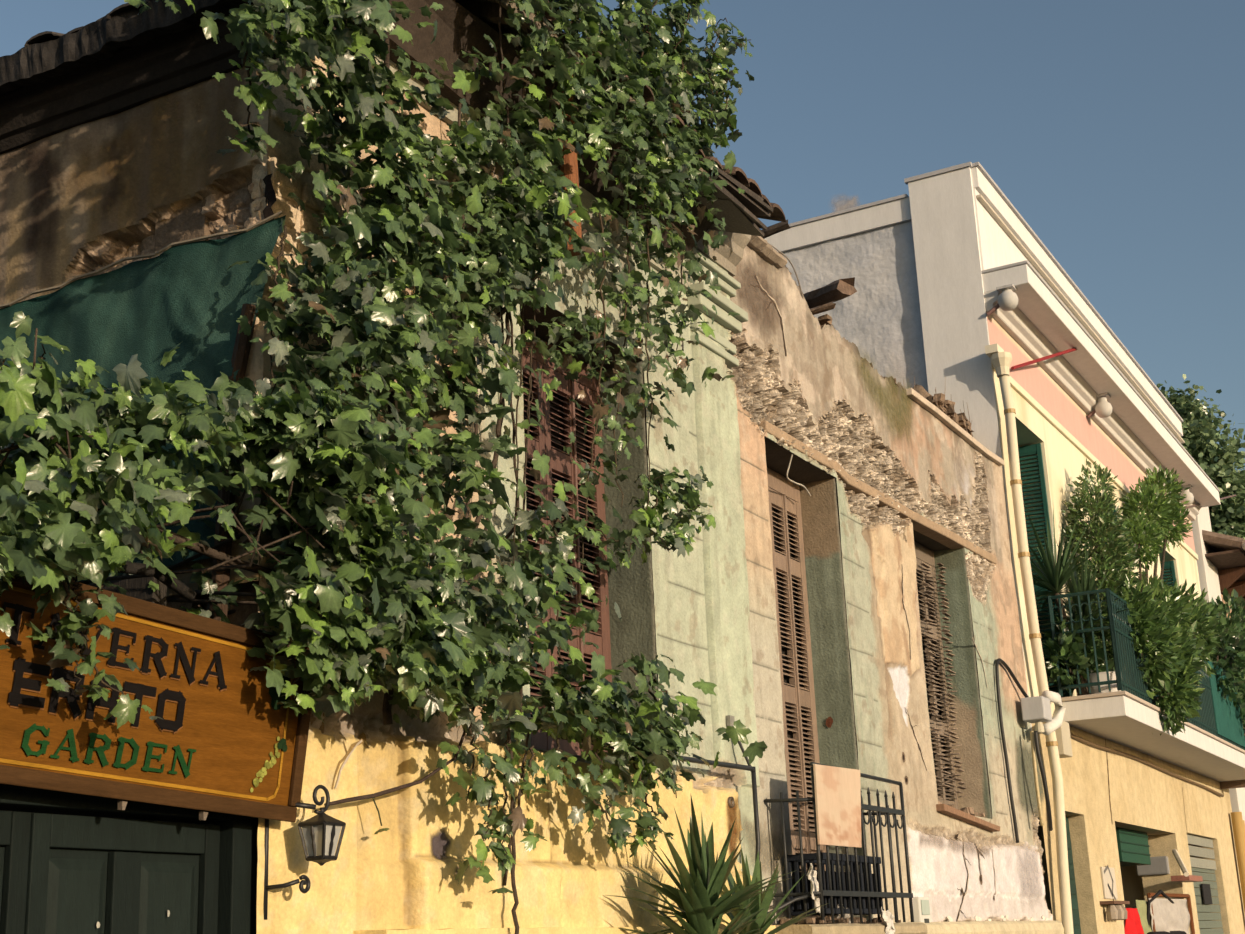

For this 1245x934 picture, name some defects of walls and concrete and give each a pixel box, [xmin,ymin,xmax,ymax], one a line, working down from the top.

leakage [27,150,52,253]
spalling [62,158,267,284]
spalling [725,328,997,728]
crack [902,565,912,660]
crack [905,707,928,770]
crack [955,834,996,921]
spalling [909,807,1053,922]